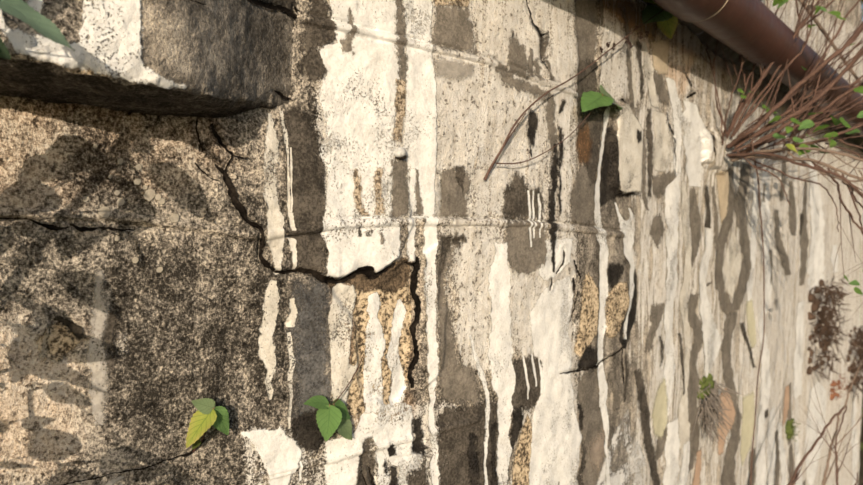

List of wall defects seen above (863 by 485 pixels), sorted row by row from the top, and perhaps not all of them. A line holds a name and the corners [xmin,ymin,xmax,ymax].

crack [249,0,299,18]
crack [0,217,133,232]
crack [194,120,421,388]
damp [250,0,809,485]
spalling [36,316,84,362]
spalling [327,257,412,418]
spalling [574,272,630,357]
crack [62,439,206,485]